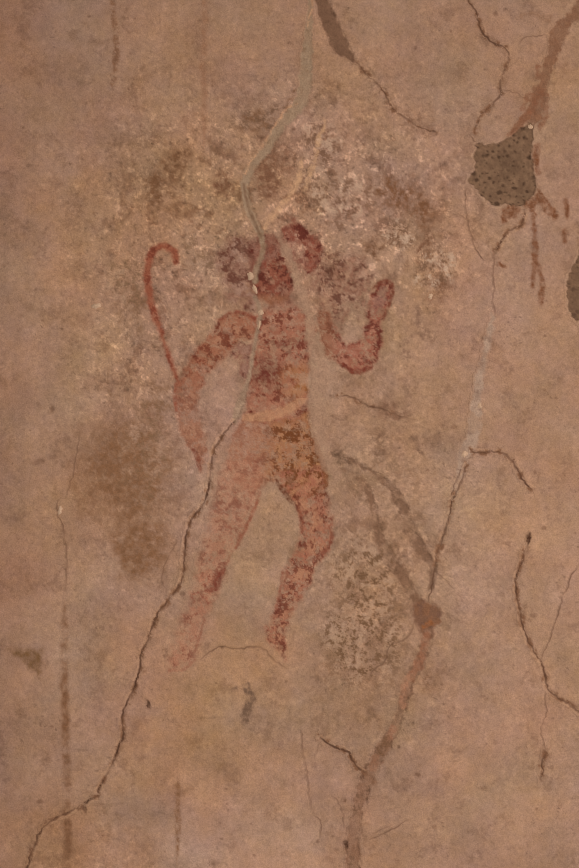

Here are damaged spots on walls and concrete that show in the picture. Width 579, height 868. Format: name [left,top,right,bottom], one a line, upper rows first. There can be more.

crack [351,58,440,135]
crack [464,0,548,144]
flaking render [465,119,539,210]
crack [457,189,530,316]
flaking render [564,246,579,335]
crack [427,444,536,602]
crack [23,416,240,868]
crack [199,645,287,669]
crack [370,624,414,678]
crack [510,544,579,784]
crack [301,730,369,838]